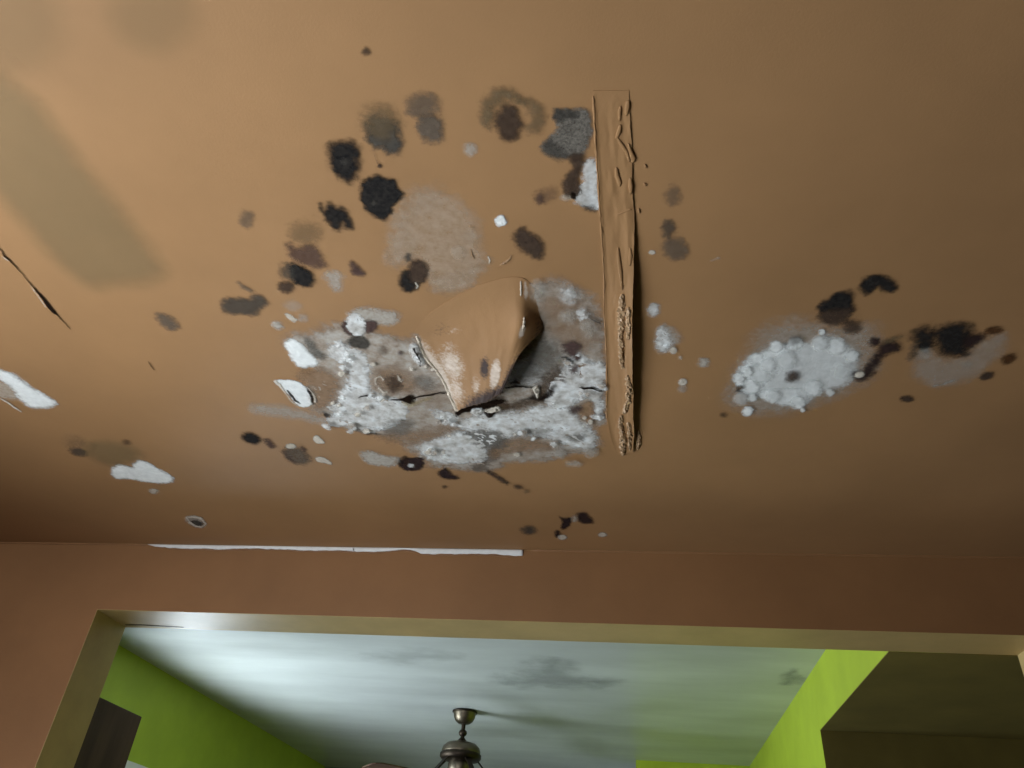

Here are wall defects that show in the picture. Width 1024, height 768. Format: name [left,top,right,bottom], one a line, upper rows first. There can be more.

mould [327,115,403,220]
mould [481,90,597,211]
mould [319,204,353,230]
crack [0,249,70,329]
leakage [278,245,365,293]
mould [398,254,428,292]
leakage [734,275,900,416]
peeling [0,370,56,412]
crack [359,392,445,406]
spalling [274,281,632,471]
peeling [111,460,173,493]
peeling [148,544,523,558]